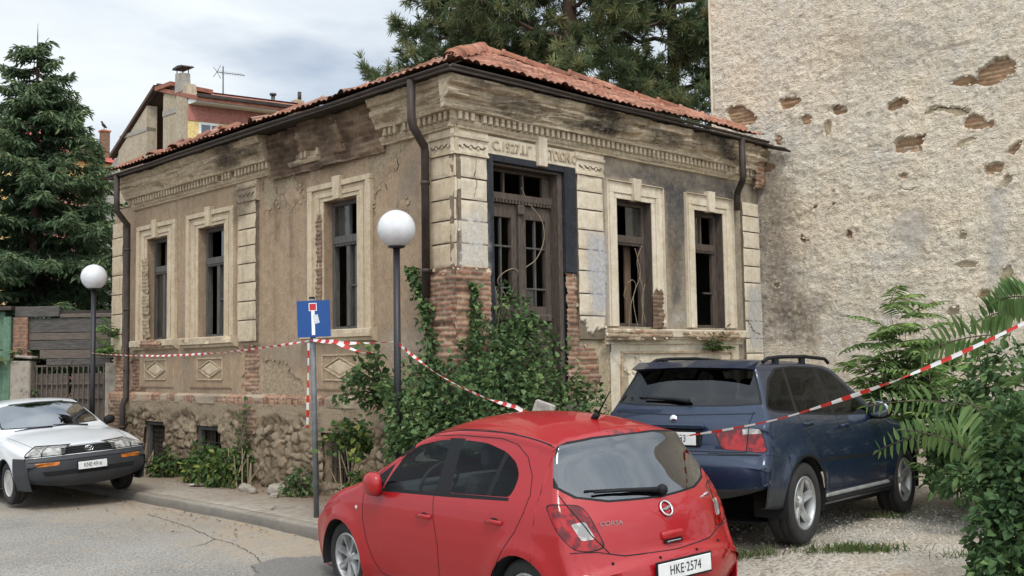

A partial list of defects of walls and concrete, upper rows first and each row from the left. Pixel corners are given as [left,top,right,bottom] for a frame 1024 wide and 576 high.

spalling [950,58,1017,87]
spalling [728,105,759,126]
spalling [777,95,847,137]
spalling [886,96,910,111]
spalling [896,132,925,153]
spalling [922,105,995,148]
spalling [981,164,1012,189]
flaking render [314,214,322,300]
flaking render [428,266,492,423]
flaking render [565,273,741,415]